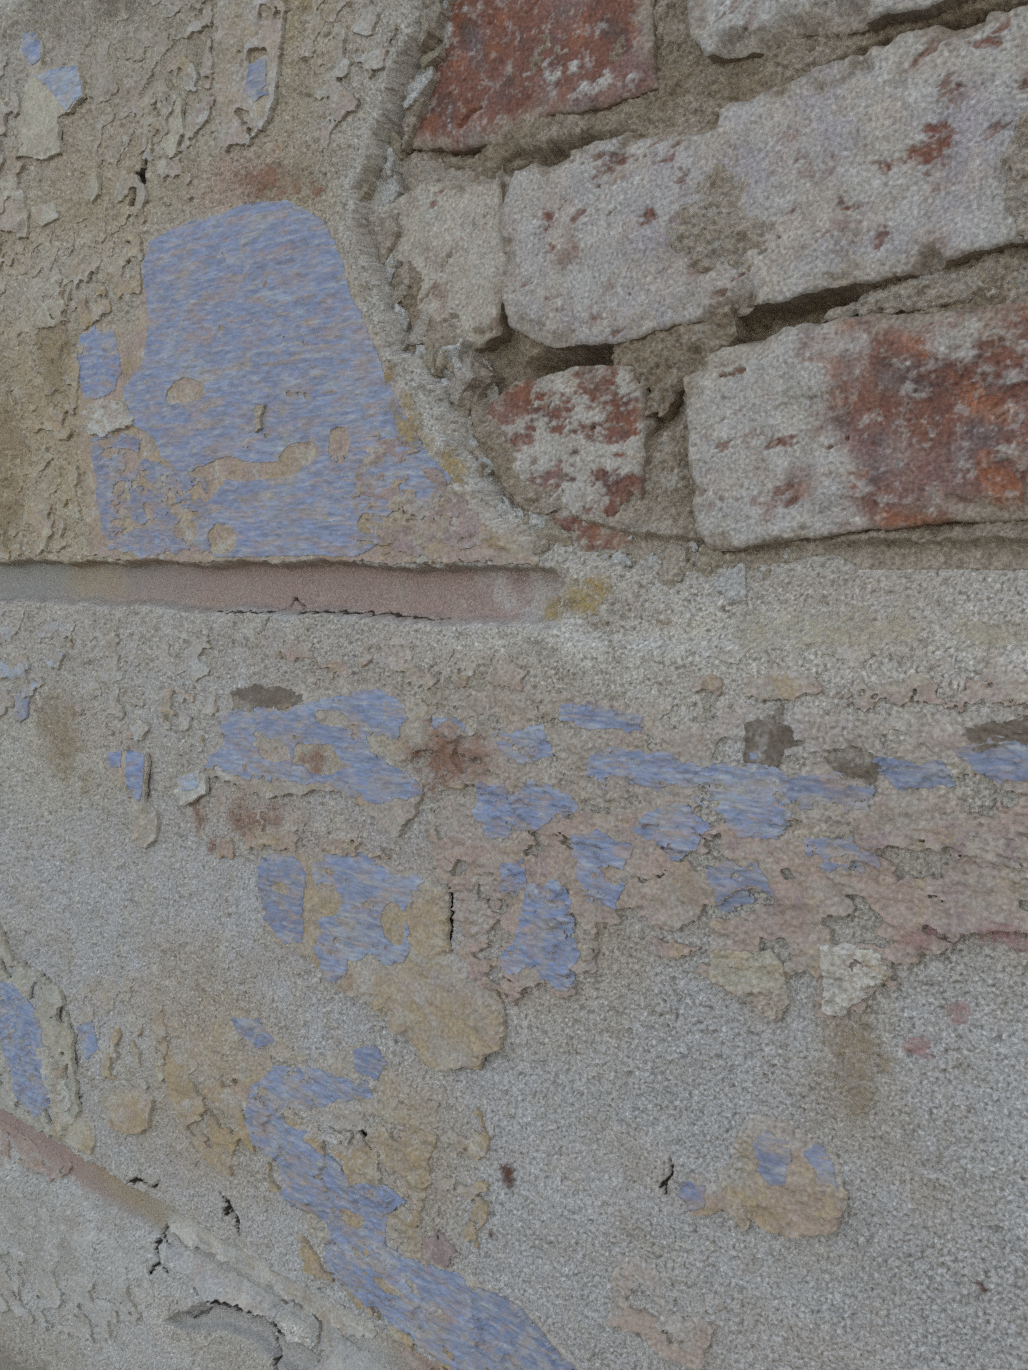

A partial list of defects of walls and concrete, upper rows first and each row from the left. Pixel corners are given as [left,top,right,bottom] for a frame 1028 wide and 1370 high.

flaking render [0,0,1028,604]
peeling [103,747,161,849]
peeling [0,926,100,1182]
peeling [154,639,1028,1370]
crack [129,1177,159,1188]
crack [150,1227,170,1274]
crack [222,1196,240,1232]
crack [193,1300,321,1370]